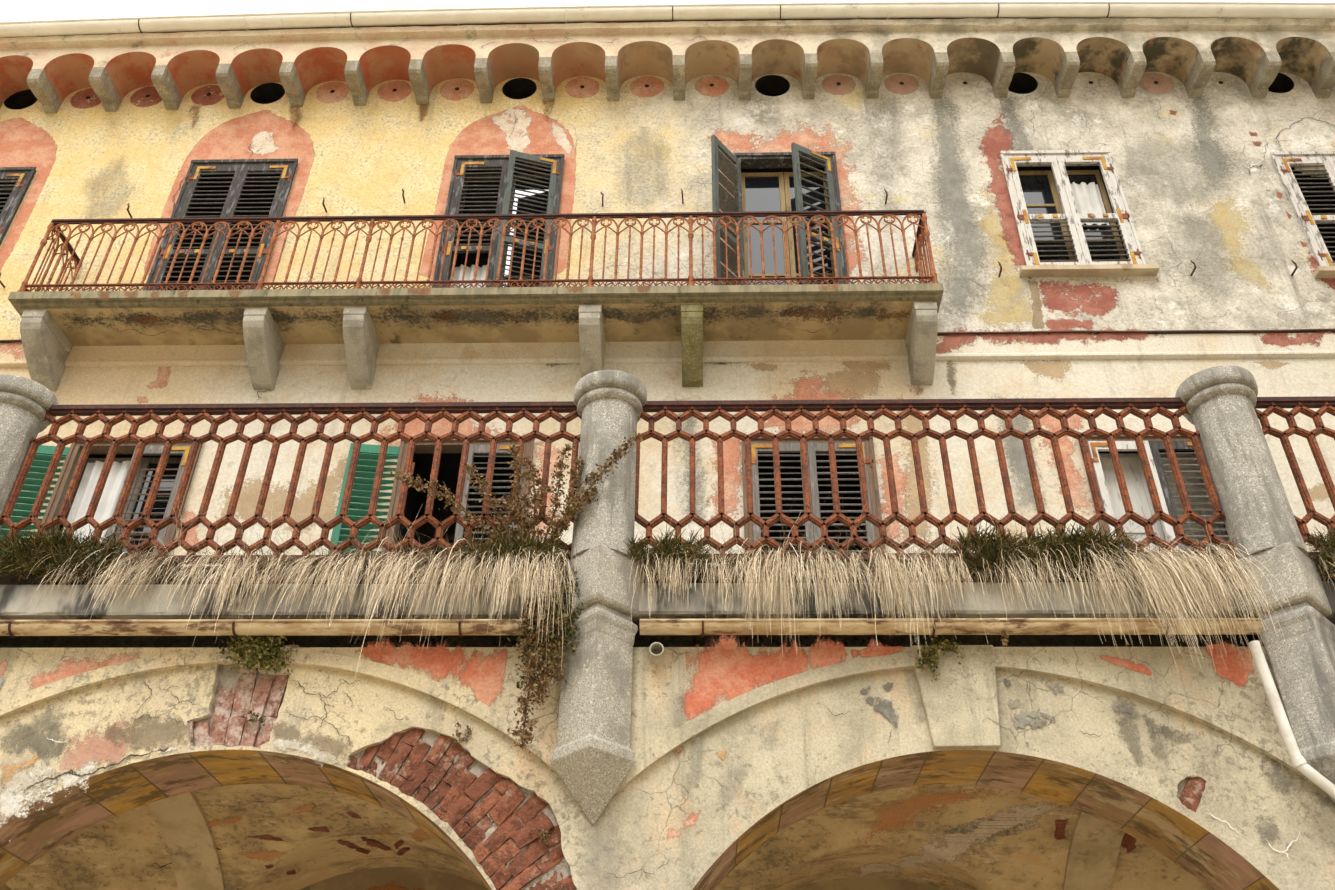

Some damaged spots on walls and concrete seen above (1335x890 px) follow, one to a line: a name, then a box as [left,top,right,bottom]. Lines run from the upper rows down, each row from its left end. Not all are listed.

peeling [492,107,532,153]
crack [1247,117,1334,173]
peeling [973,190,1120,329]
peeling [1253,328,1335,350]
spalling [187,663,290,755]
crack [280,679,362,743]
peeling [355,639,507,707]
peeling [672,636,903,720]
spalling [859,682,899,728]
water stain [0,705,98,828]
spalling [346,726,577,890]
spalling [1176,776,1207,813]